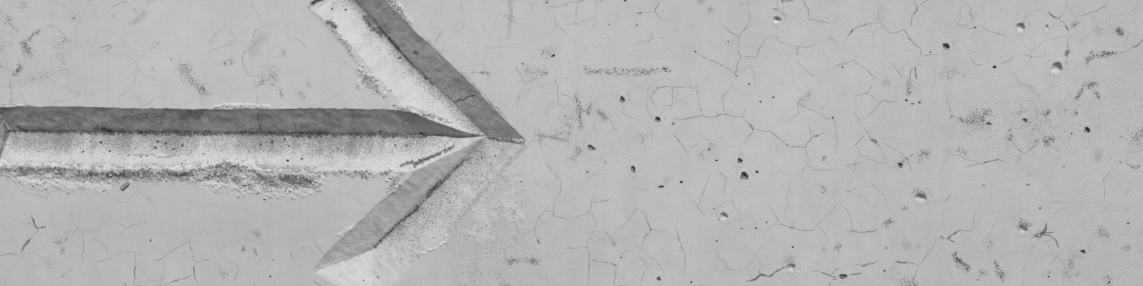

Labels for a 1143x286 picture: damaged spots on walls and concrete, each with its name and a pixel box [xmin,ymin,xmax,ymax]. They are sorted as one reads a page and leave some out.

crack [957,1,1108,66]
crack [650,0,937,237]
crack [128,151,183,159]
crack [530,129,727,286]
crack [967,143,1037,167]
crack [1103,164,1141,197]
crack [0,215,261,286]
crack [748,211,975,286]
crack [1035,223,1079,283]